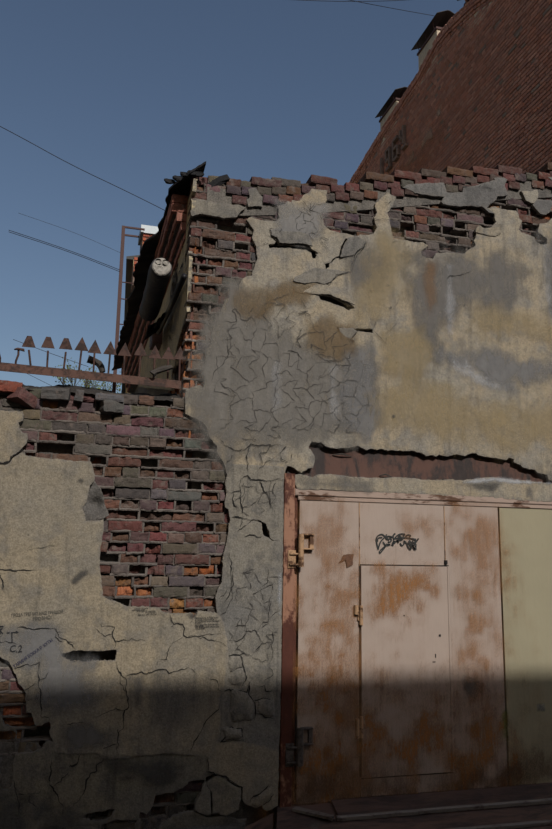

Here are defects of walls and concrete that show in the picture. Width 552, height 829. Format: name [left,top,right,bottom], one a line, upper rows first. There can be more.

spalling [322,200,376,258]
spalling [388,197,552,258]
spalling [0,175,315,615]
crack [213,201,369,537]
damp [405,252,552,390]
spalling [0,657,52,756]
crack [0,626,75,647]
crack [13,553,282,817]
rust [374,563,438,616]
spalling [86,775,215,829]